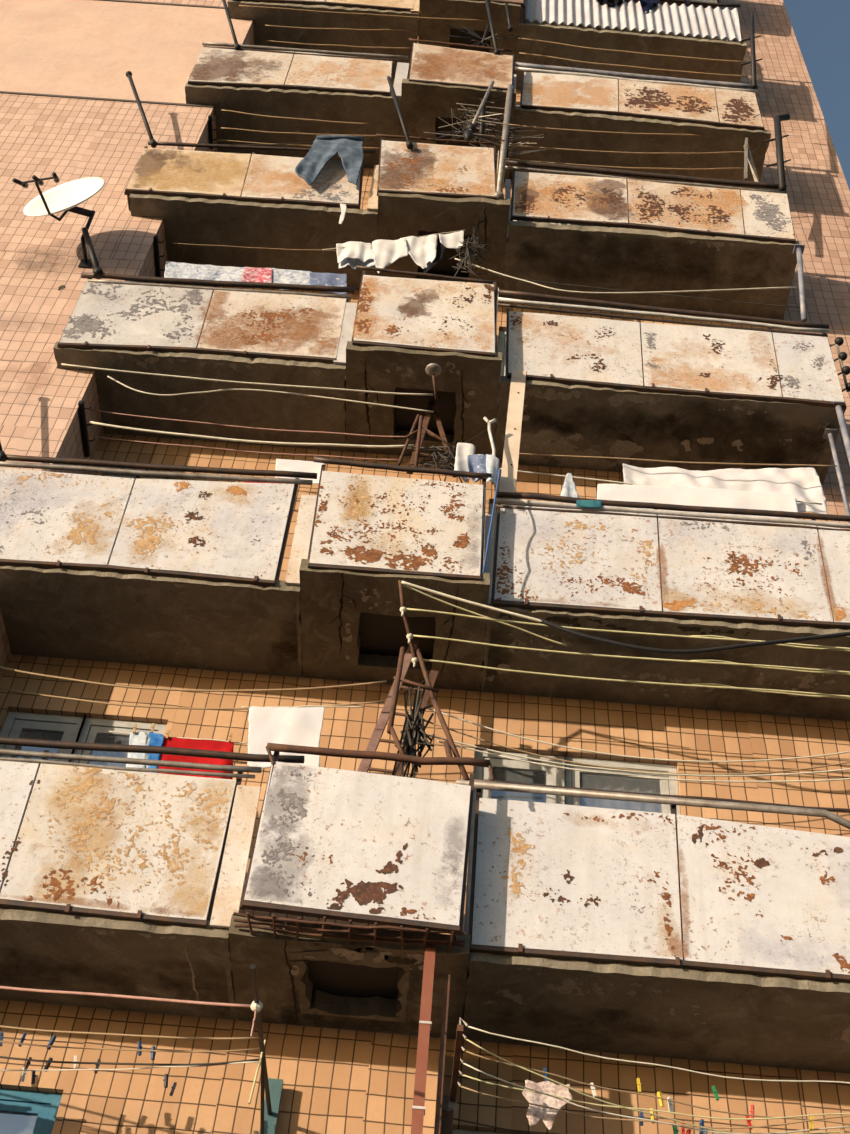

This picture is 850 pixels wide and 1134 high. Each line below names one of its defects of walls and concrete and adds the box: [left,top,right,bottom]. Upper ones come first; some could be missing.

corrosion [624,86,760,123]
corrosion [515,179,731,224]
corrosion [198,291,335,353]
corrosion [226,486,247,495]
crack [327,572,357,651]
corrosion [320,532,471,573]
corrosion [496,542,538,600]
corrosion [558,549,697,611]
corrosion [821,566,846,621]
corrosion [19,868,119,909]
corrosion [327,843,408,914]
spalling [233,904,466,977]